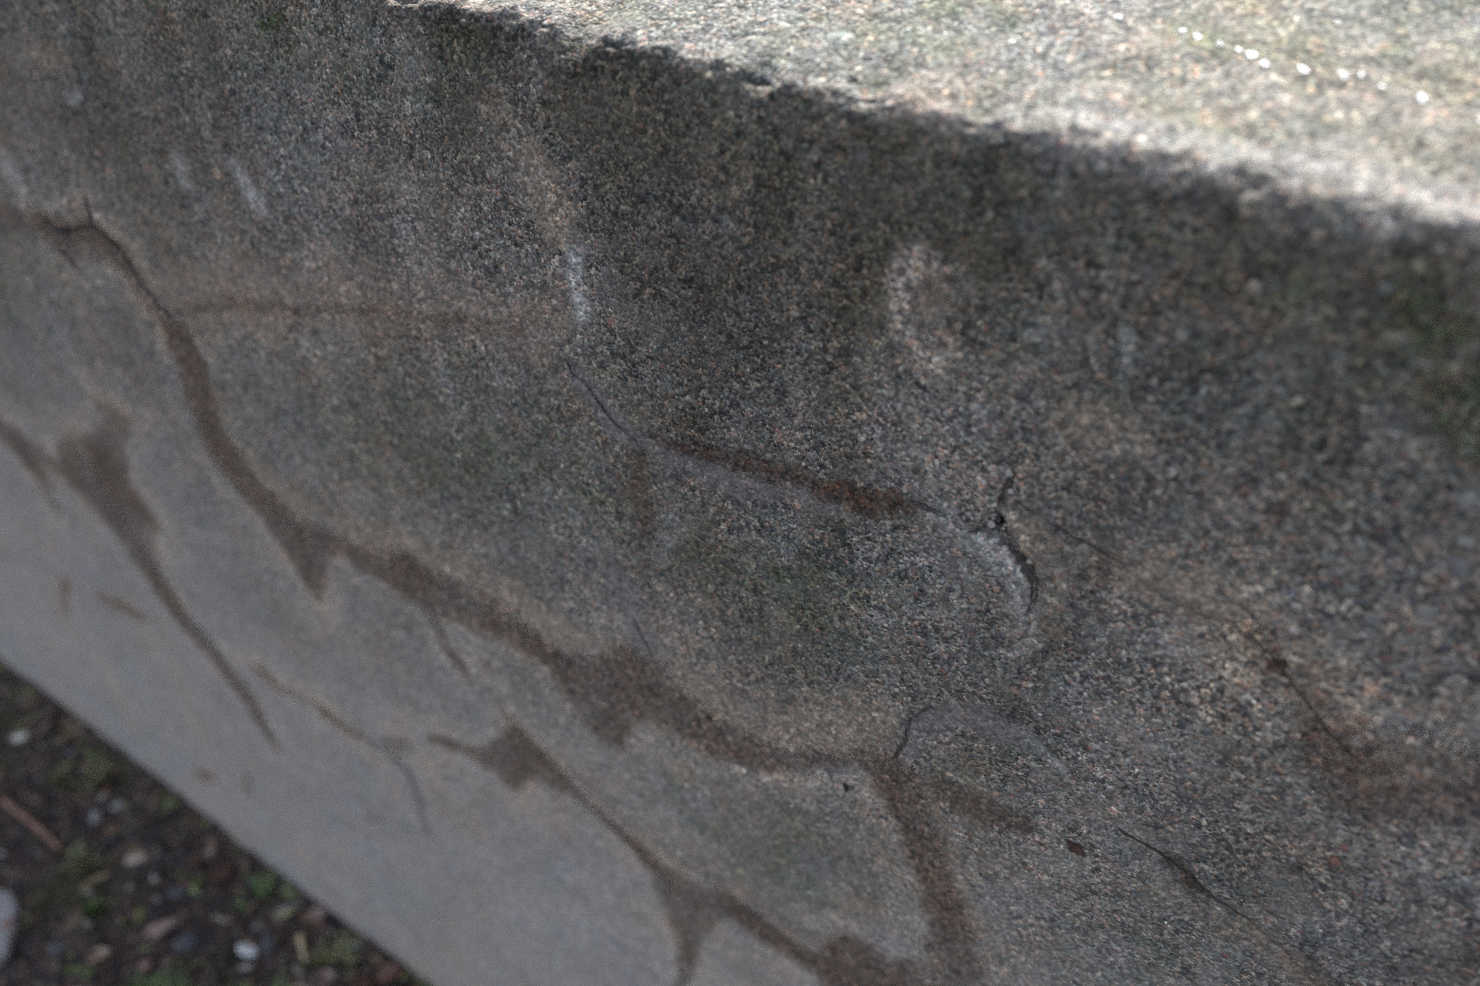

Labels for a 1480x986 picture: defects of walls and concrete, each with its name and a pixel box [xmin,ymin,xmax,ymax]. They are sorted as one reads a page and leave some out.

damp [233,161,264,215]
damp [426,102,589,367]
damp [0,417,272,738]
damp [93,227,1026,986]
crack [890,706,932,760]
damp [943,509,1048,642]
crack [909,468,1363,766]